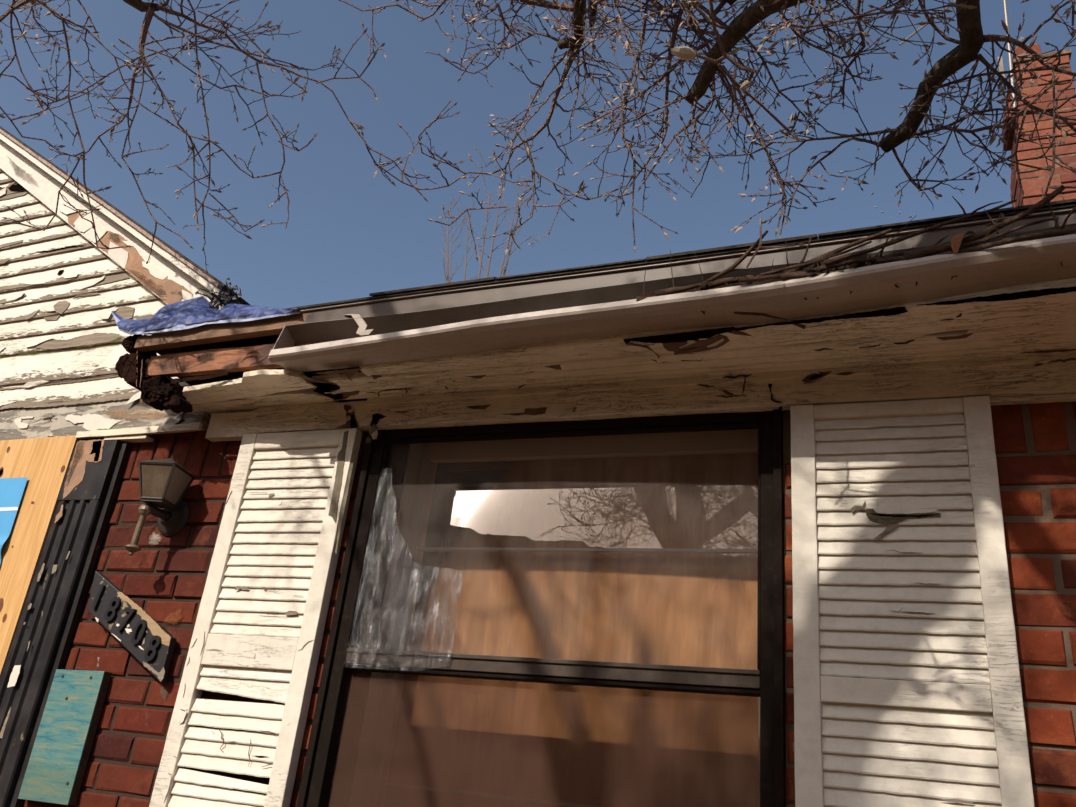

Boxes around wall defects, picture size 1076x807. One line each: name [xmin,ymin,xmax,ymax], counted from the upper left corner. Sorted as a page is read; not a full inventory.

peeling [0,201,193,320]
peeling [24,333,122,350]
peeling [623,327,751,363]
peeling [503,407,547,416]
peeling [873,505,938,514]
peeling [37,551,70,582]
peeling [117,592,171,682]
peeling [7,665,21,688]
crack [213,728,278,767]